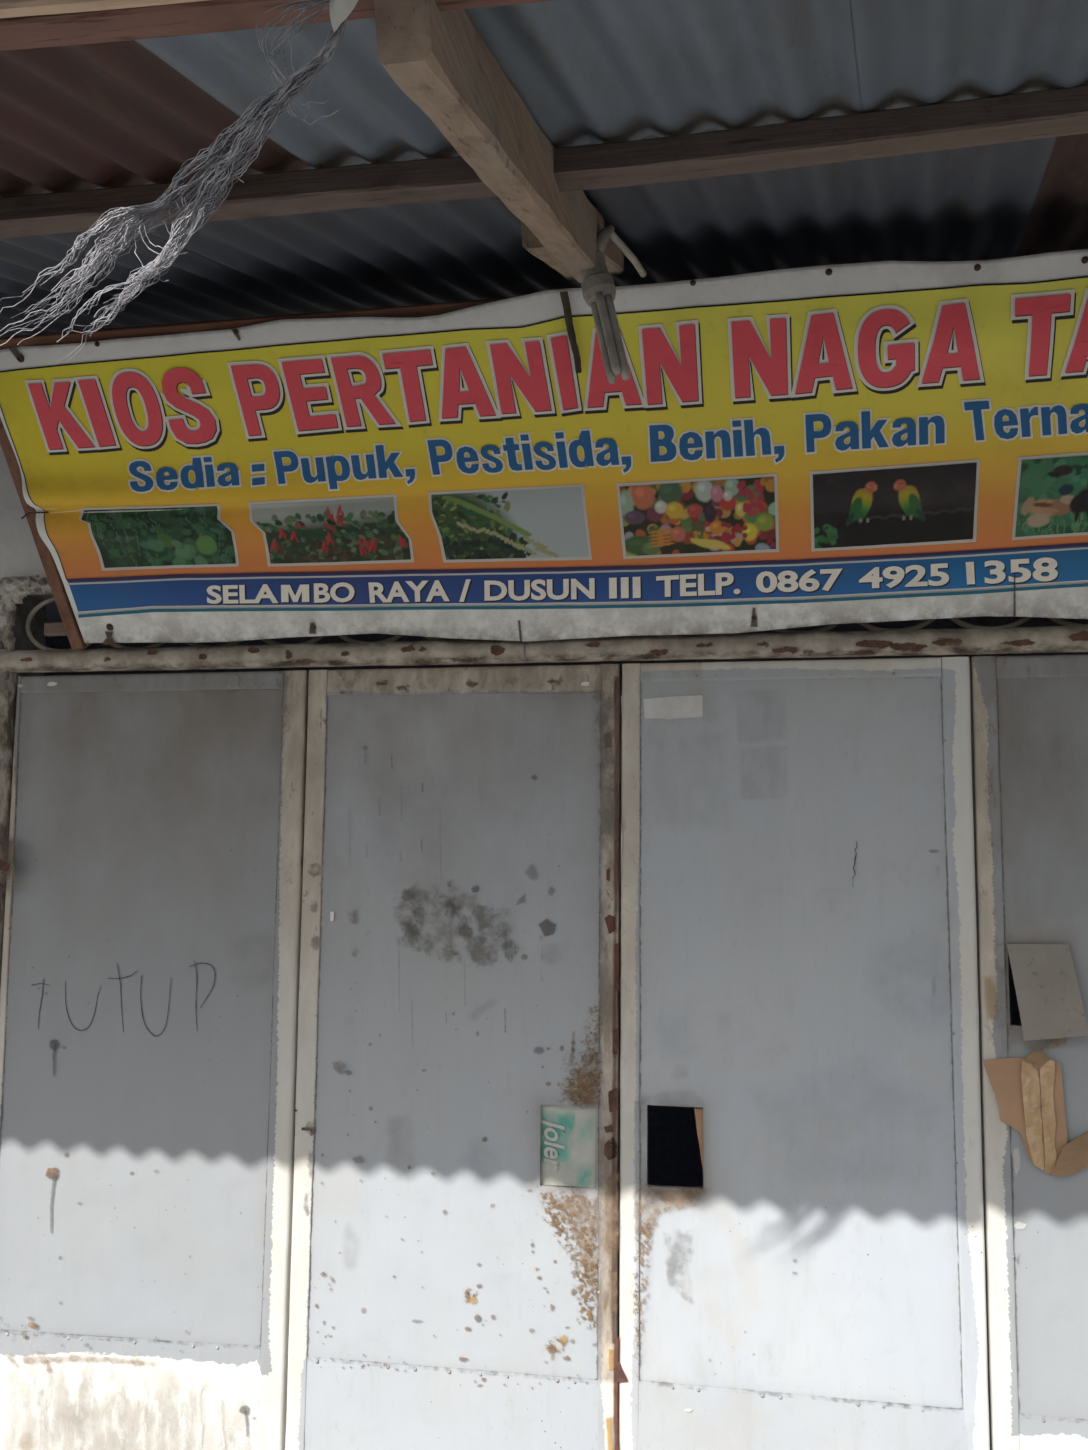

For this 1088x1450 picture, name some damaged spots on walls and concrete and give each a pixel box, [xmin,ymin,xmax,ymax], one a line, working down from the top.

corrosion [1069,631,1088,641]
corrosion [279,650,349,666]
corrosion [401,645,505,663]
corrosion [641,649,668,660]
corrosion [757,641,814,656]
corrosion [850,638,1035,656]
corrosion [542,677,628,1450]
corrosion [635,1189,705,1347]